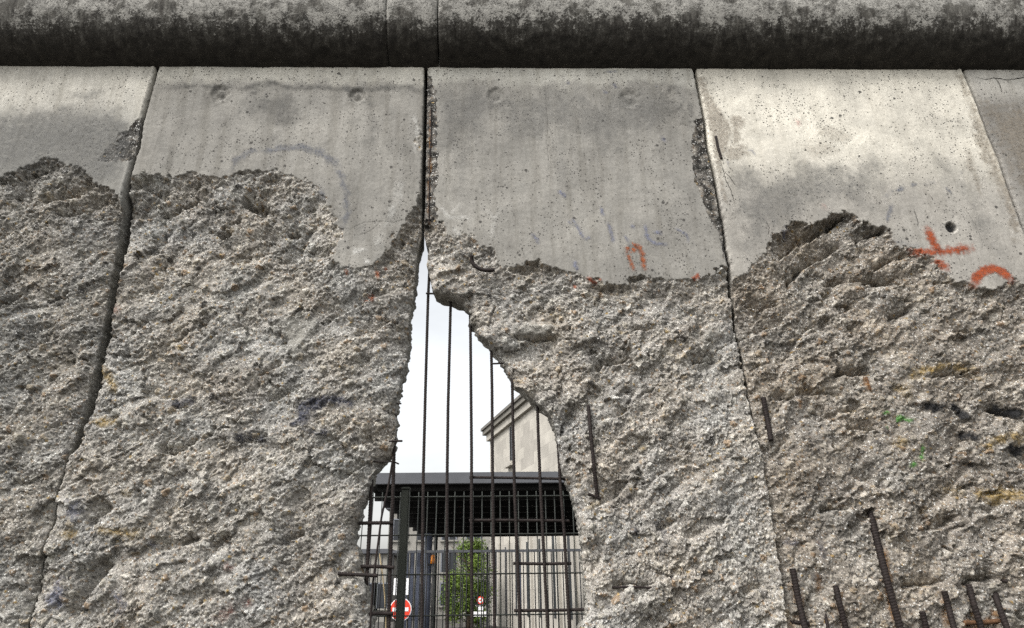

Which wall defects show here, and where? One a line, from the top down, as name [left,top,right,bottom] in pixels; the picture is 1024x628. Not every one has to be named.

spalling [0,75,439,628]
spalling [690,77,747,258]
spalling [424,210,1024,628]